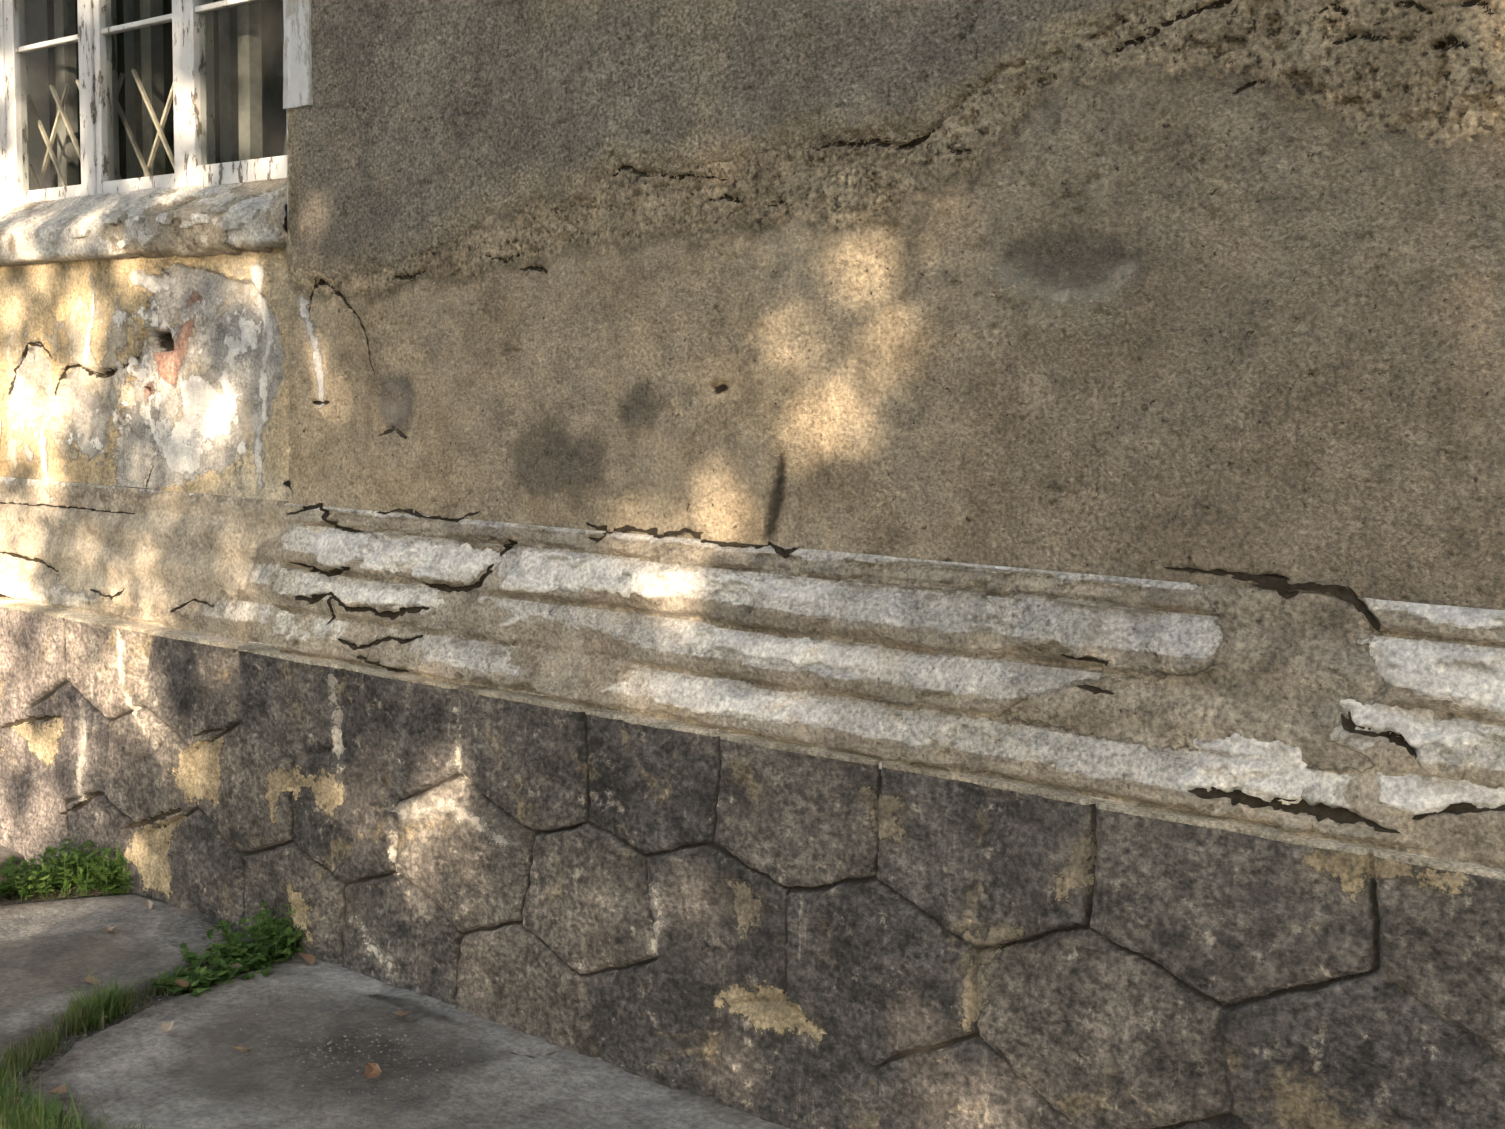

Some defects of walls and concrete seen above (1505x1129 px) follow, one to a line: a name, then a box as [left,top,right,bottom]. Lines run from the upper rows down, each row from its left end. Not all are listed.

peeling [72,207,261,249]
crack [308,272,375,375]
flaking render [1,263,285,490]
peeling [295,529,834,608]
peeling [649,677,838,727]
peeling [678,624,879,672]
peeling [1340,598,1505,749]
peeling [1175,733,1313,805]
peeling [1376,772,1505,815]